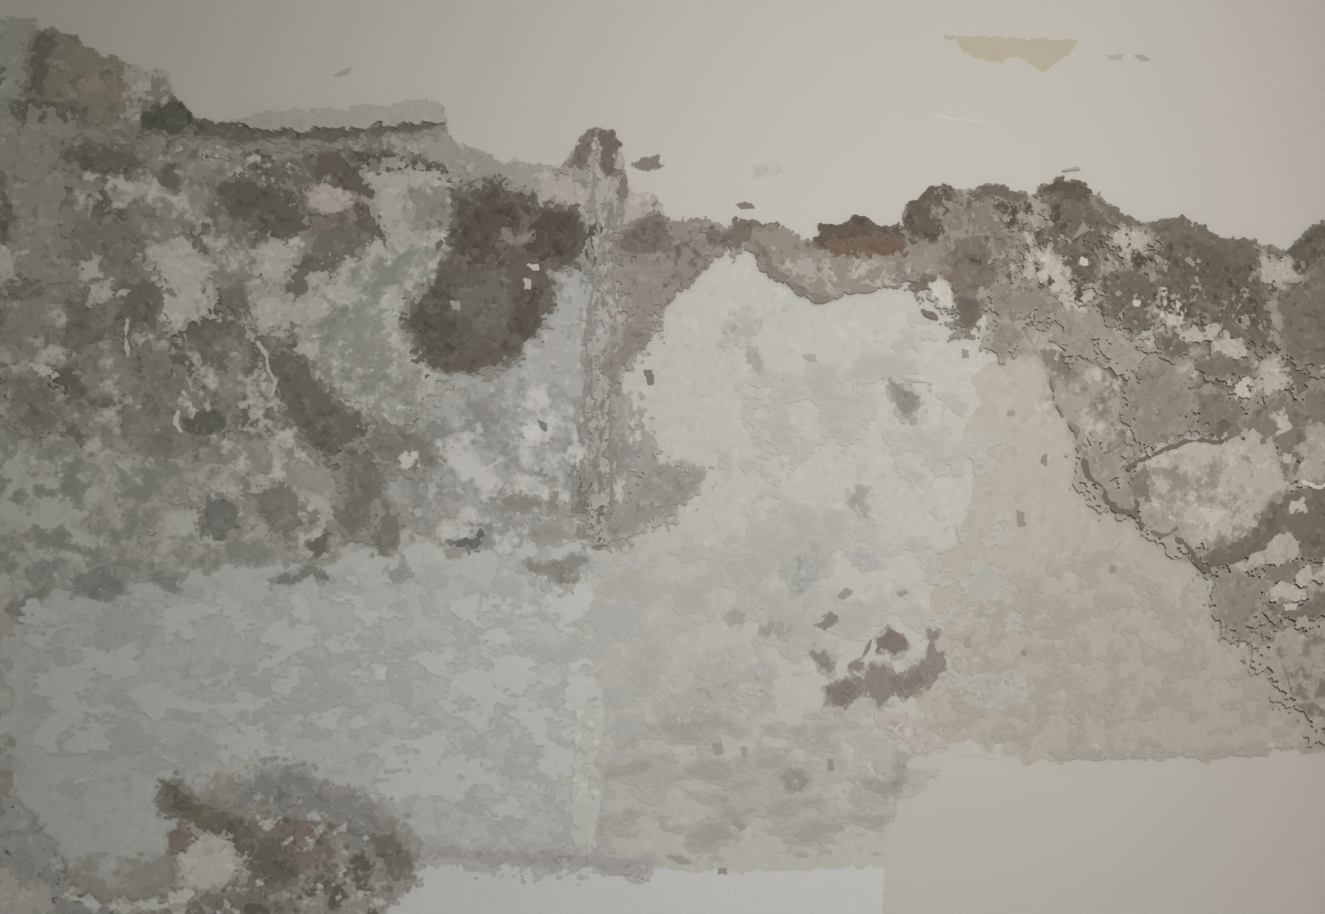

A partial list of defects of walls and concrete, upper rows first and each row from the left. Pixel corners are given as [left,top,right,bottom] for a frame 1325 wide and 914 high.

peeling [944,34,1079,72]
flaking render [0,19,717,914]
damp [0,16,1325,719]
spalling [882,372,932,424]
peeling [927,273,956,318]
peeling [952,183,1325,747]
crack [1050,375,1264,574]
crack [1301,480,1325,489]
damp [660,588,949,811]
damp [1049,740,1325,762]
damp [0,795,110,914]
damp [151,756,691,914]